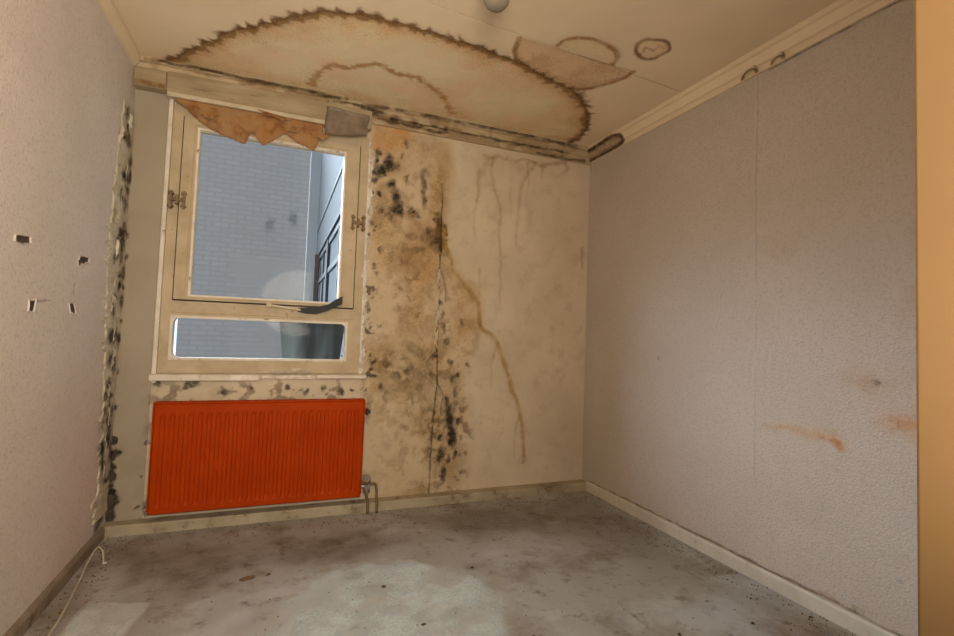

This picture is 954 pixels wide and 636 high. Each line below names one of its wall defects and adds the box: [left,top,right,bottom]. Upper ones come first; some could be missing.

damp [160,7,635,152]
damp [634,39,671,60]
damp [367,135,453,270]
damp [425,373,459,475]
damp [95,436,122,530]